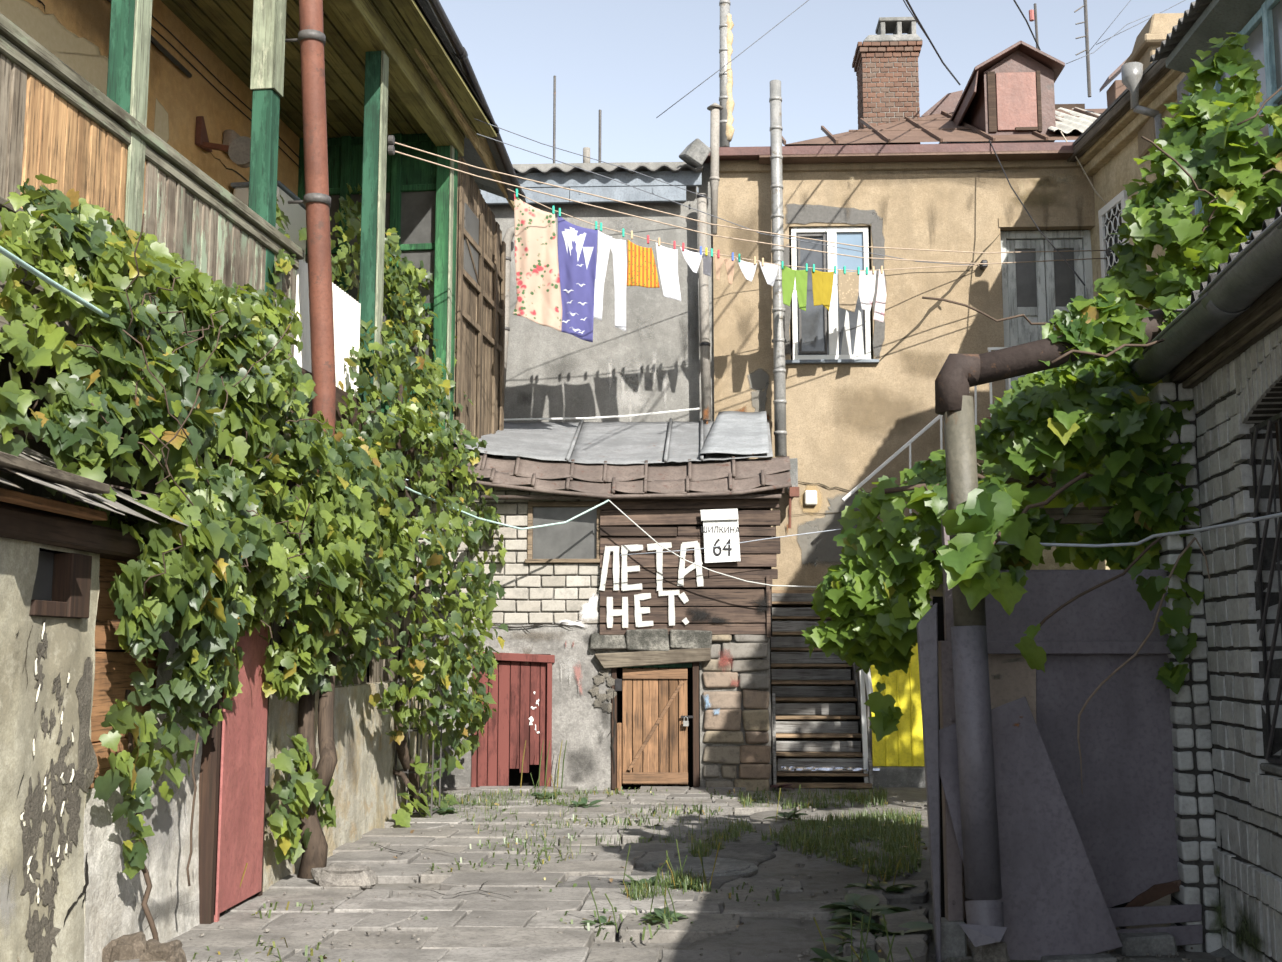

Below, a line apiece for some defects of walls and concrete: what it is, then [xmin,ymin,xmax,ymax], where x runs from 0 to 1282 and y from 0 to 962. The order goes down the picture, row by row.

peeling [20,619,98,962]
crack [63,853,89,927]